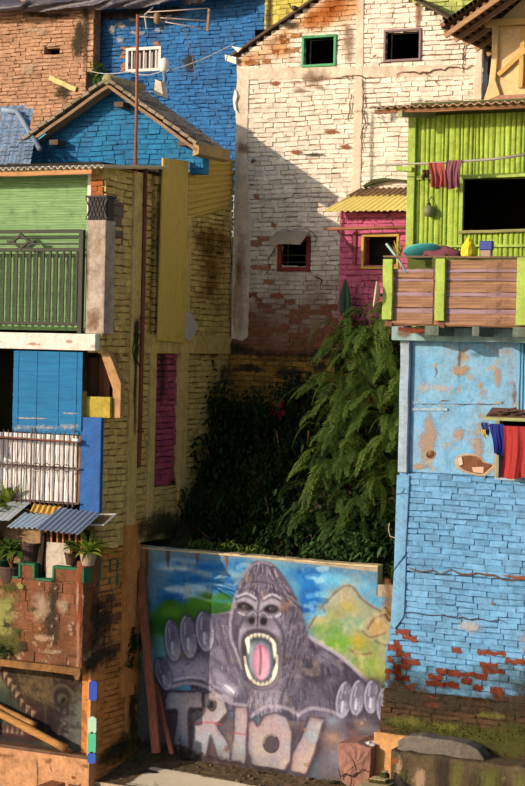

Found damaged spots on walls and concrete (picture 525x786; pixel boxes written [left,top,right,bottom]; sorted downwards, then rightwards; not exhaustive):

crack [396,41,475,79]
crack [335,75,371,152]
flaking render [250,236,271,247]
crack [264,228,317,276]
flaking render [248,264,338,353]
peeling [414,417,436,469]
spalling [455,438,494,476]
crack [408,567,519,581]
flaking render [385,628,525,708]